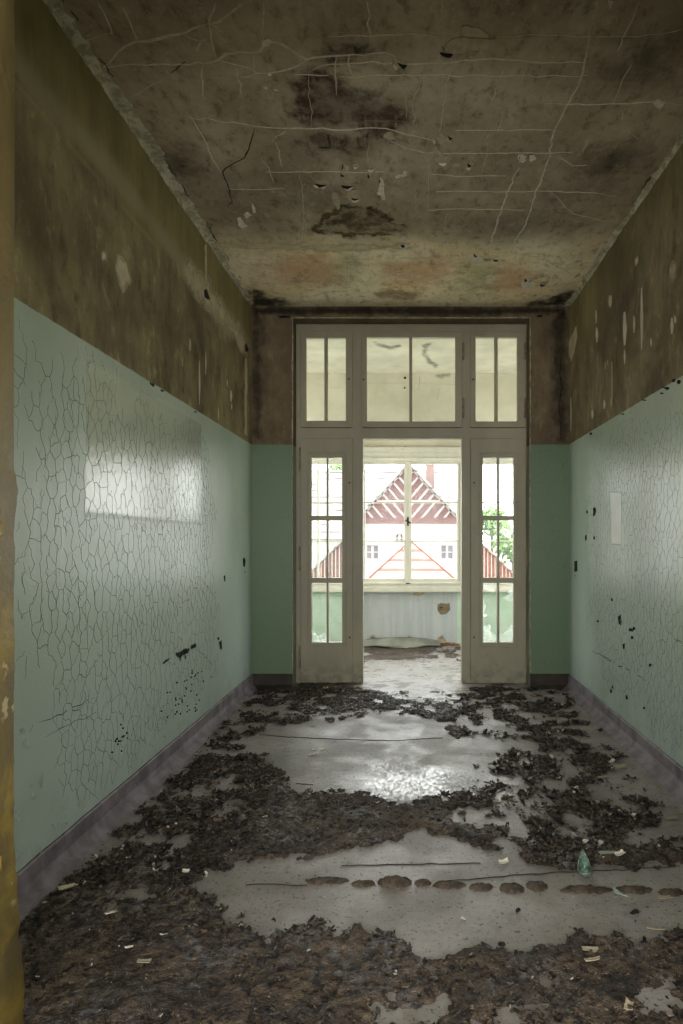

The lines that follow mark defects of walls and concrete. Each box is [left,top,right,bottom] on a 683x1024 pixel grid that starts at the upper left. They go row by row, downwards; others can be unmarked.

water stain [290,45,410,153]
water stain [311,204,406,238]
peeling [314,163,407,210]
crack [86,1,682,254]
water stain [182,261,577,438]
crack [14,321,220,799]
crack [586,406,683,752]